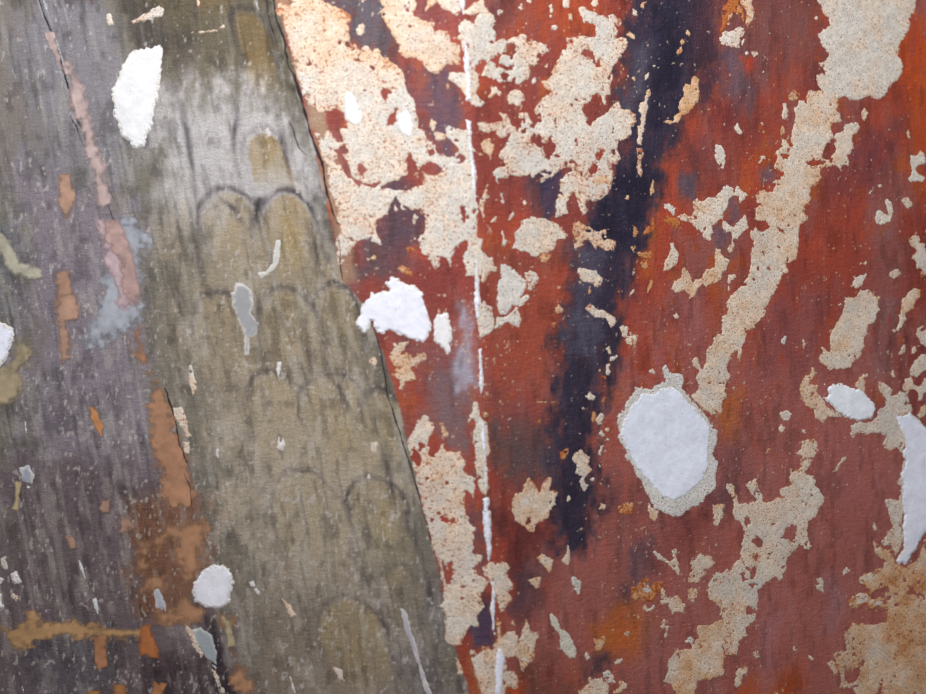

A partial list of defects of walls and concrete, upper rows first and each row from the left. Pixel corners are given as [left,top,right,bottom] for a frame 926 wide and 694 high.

rust [55,271,80,362]
rust [44,32,111,208]
rust [1,597,204,669]
rust [134,330,197,508]
rust [136,520,211,593]
crack [266,0,342,274]
crack [370,319,433,548]
peeling [276,0,656,347]
peeling [407,348,539,694]
peeling [511,477,571,533]
peeling [631,430,825,694]
peeling [631,0,916,415]